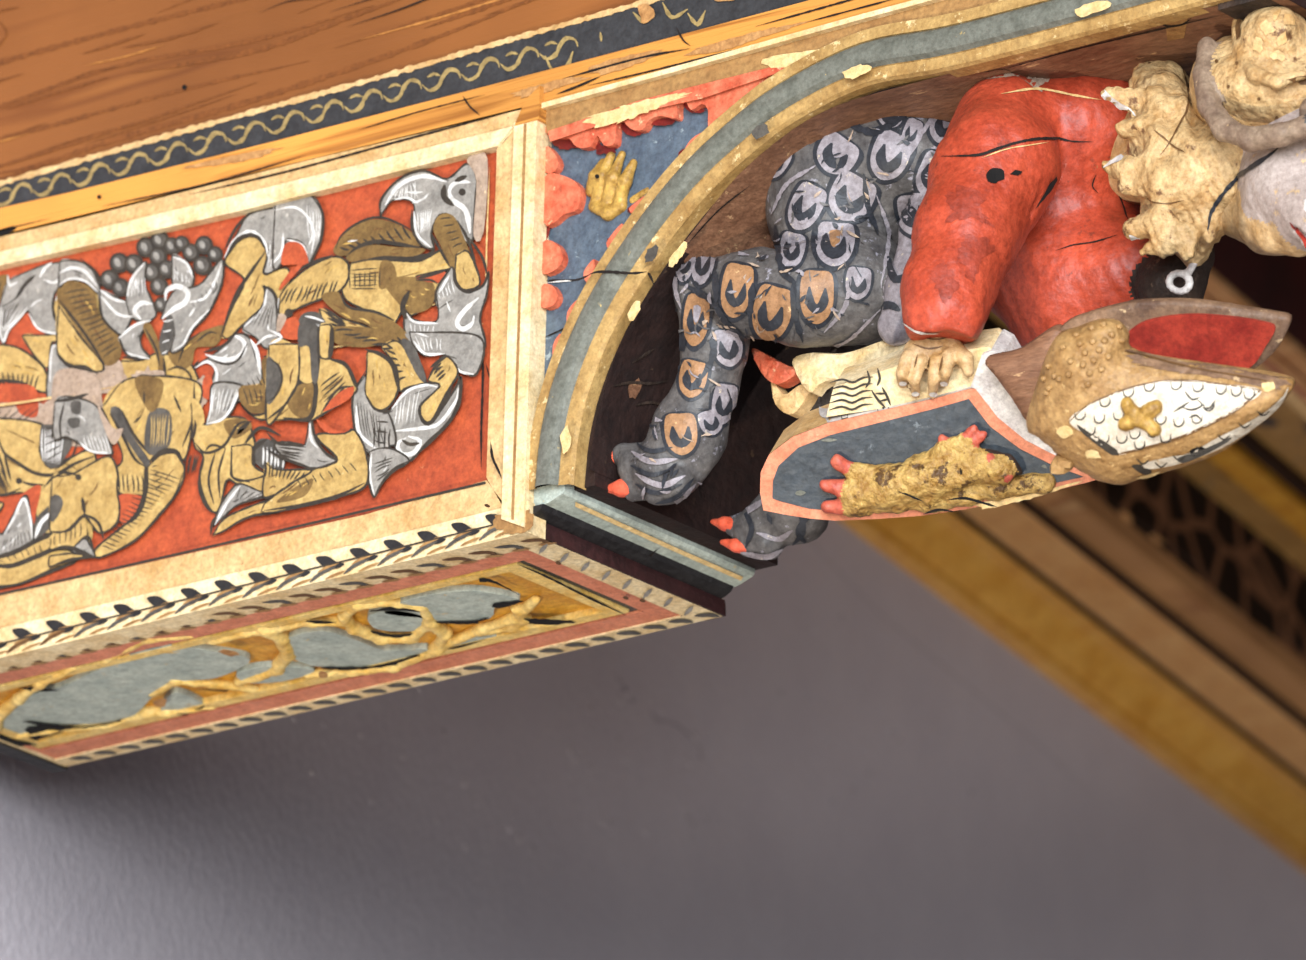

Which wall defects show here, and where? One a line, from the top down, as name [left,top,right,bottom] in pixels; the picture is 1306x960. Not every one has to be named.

peeling [638,3,655,24]
crack [547,270,654,285]